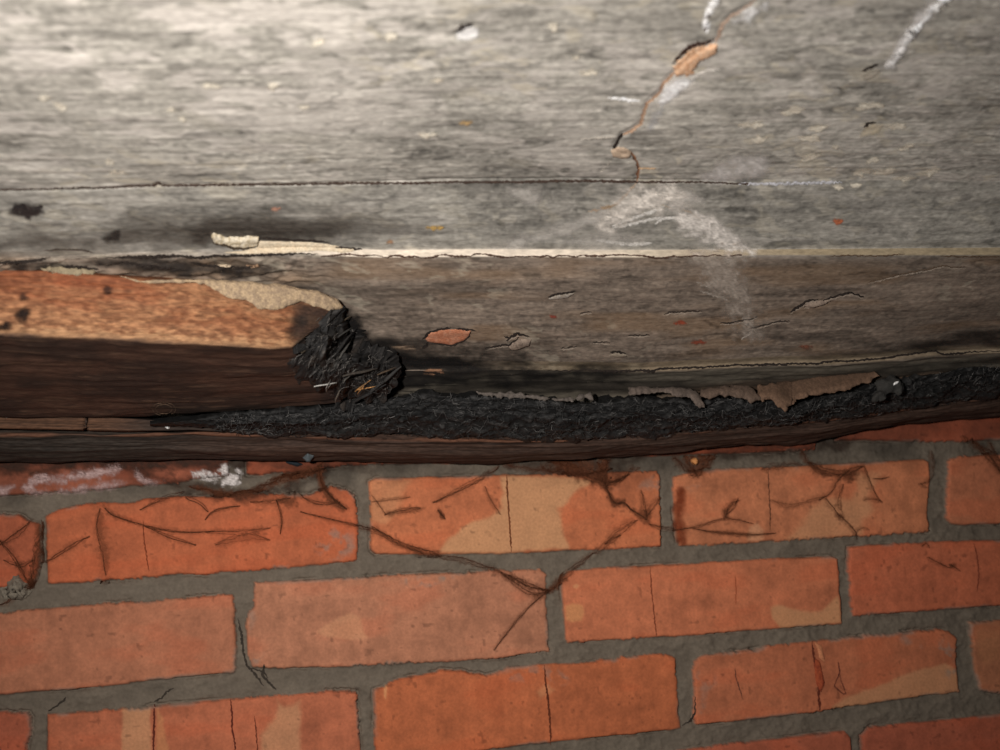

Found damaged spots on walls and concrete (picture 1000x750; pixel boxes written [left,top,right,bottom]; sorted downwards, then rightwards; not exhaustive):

crack [0,0,755,214]
crack [0,248,742,265]
spalling [0,308,30,329]
spalling [395,327,475,350]
crack [665,254,1000,330]
peeling [476,390,594,402]
peeling [628,371,879,412]
leakage [0,459,246,494]
crack [505,475,513,552]
crack [238,620,276,690]
crack [152,688,174,750]
crack [544,666,552,744]